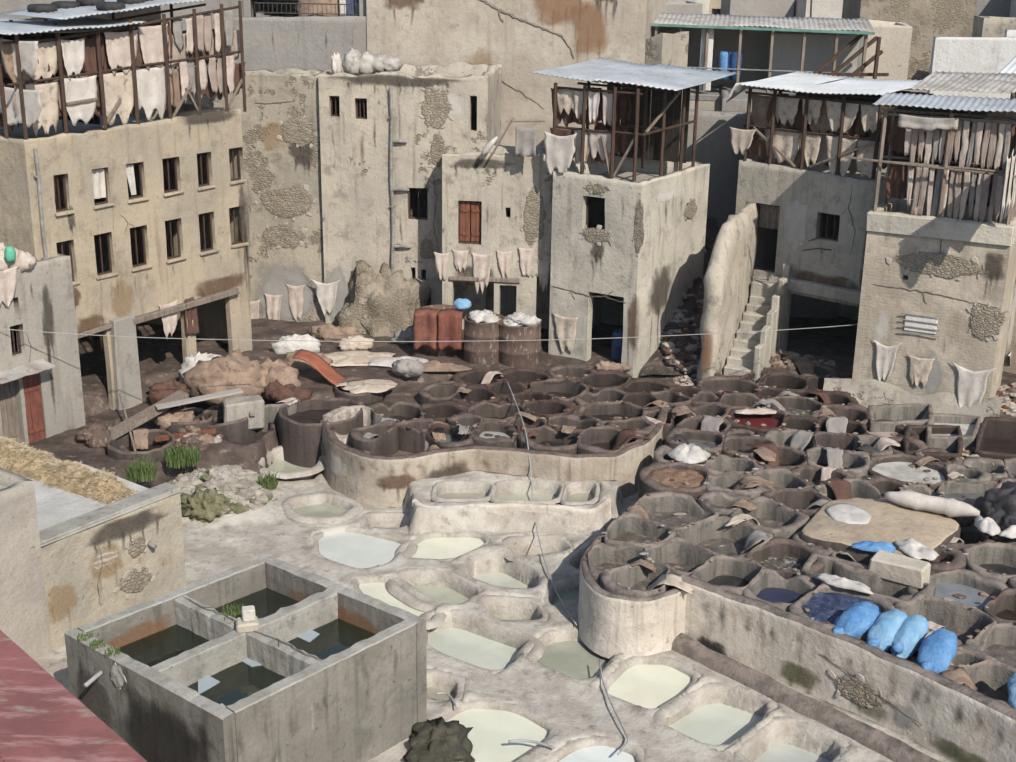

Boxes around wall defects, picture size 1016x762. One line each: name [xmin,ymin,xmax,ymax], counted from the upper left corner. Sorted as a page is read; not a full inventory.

leakage [389,0,424,16]
crack [480,0,574,58]
peeling [276,116,314,149]
peeling [419,85,454,169]
peeling [255,184,317,249]
peeling [520,183,548,248]
peeling [886,247,989,281]
peeling [967,300,1010,342]
leakage [92,510,163,565]
peeling [113,536,156,599]